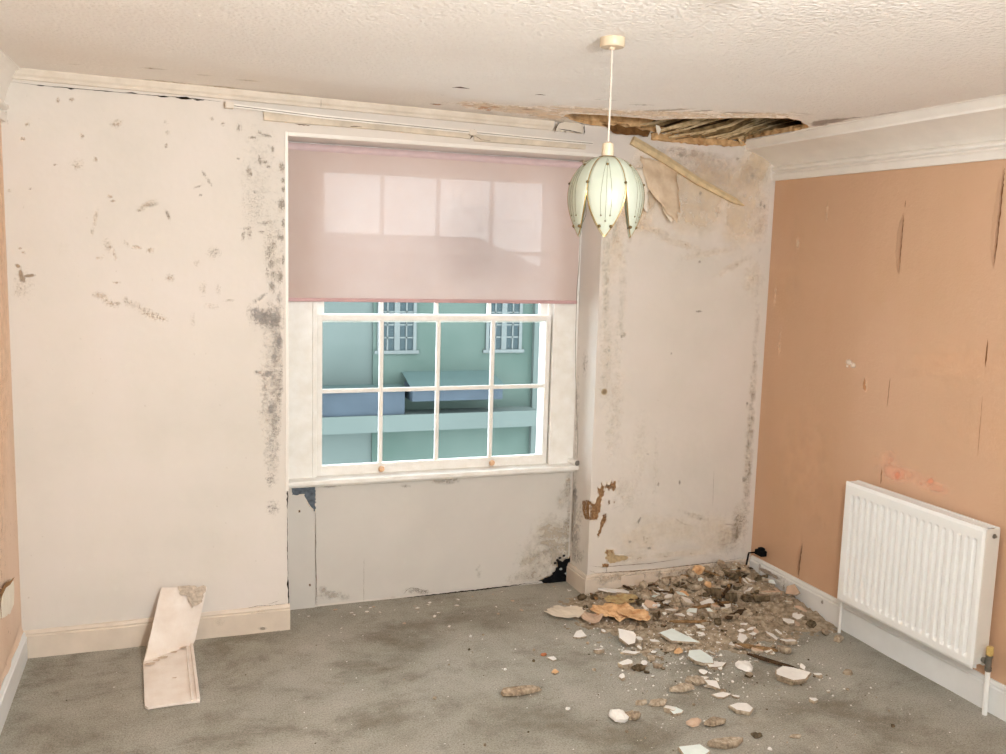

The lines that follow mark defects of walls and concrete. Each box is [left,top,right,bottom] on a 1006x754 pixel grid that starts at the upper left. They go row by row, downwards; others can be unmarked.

spalling [564,114,809,140]
water stain [242,132,285,377]
peeling [292,487,317,512]
spalling [582,479,616,538]
spalling [602,548,631,567]